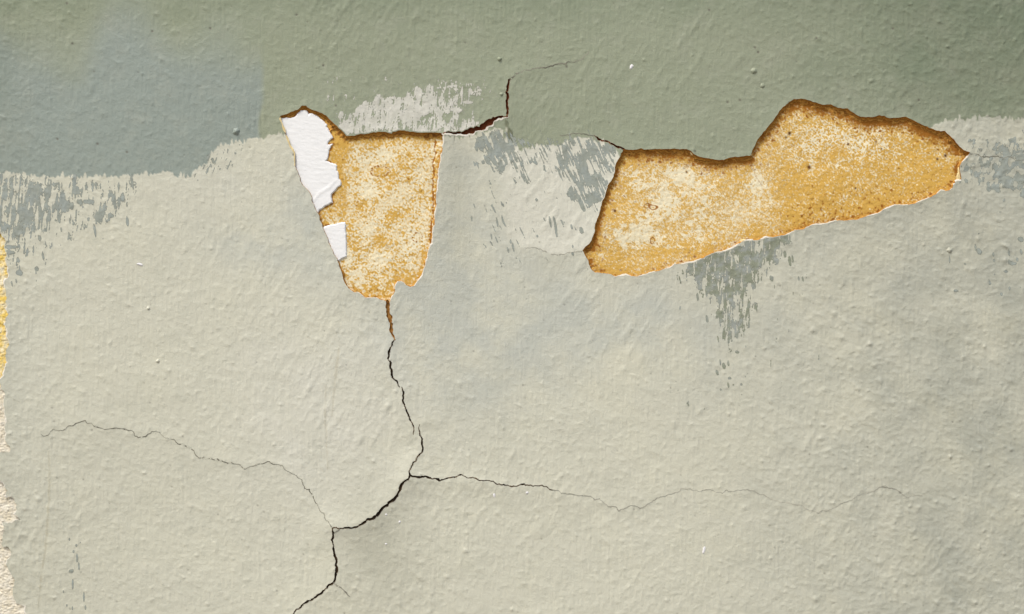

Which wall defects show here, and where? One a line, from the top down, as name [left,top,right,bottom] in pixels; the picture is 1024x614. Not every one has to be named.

crack [442,51,589,137]
crack [560,133,625,149]
flaking render [279,76,1024,395]
crack [41,300,921,614]